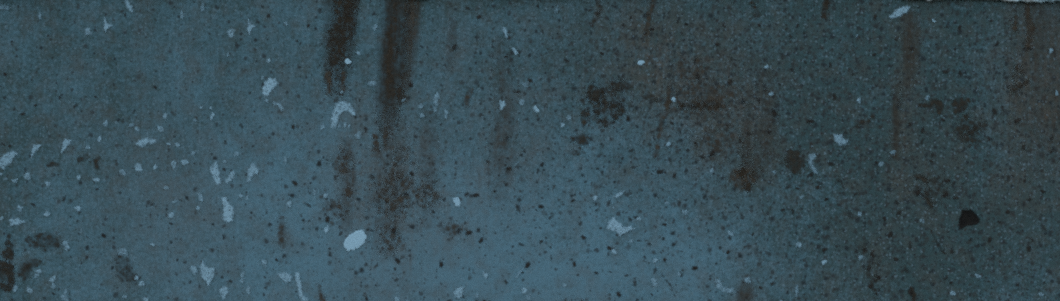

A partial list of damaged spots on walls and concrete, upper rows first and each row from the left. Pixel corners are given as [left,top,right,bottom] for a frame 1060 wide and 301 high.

corrosion [380,0,419,111]
peeling [593,191,641,255]
spalling [943,180,992,247]
peeling [13,269,69,301]
peeling [190,262,250,299]
peeling [262,258,308,301]